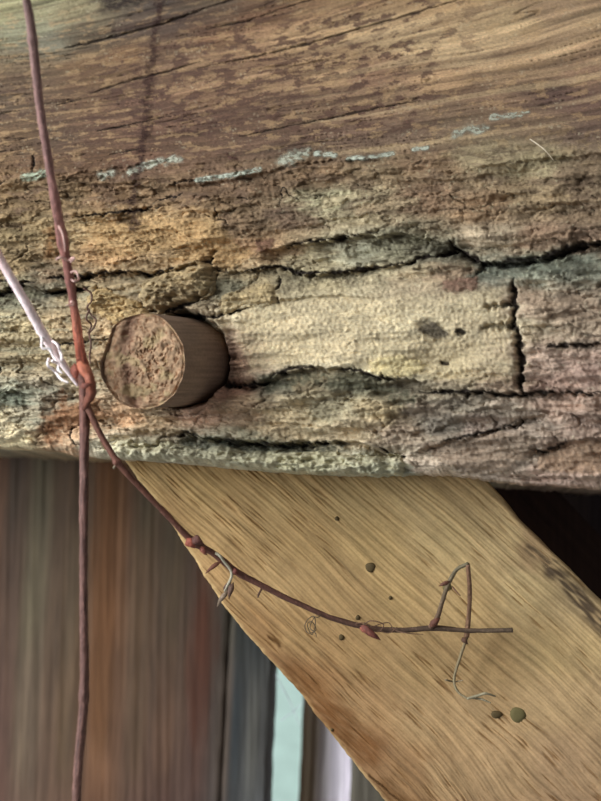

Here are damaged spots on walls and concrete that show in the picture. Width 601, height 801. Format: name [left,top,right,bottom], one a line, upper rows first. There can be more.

crack [0,267,174,297]
crack [202,234,601,399]
crack [179,431,329,448]
crack [443,417,524,441]
crack [531,439,567,454]